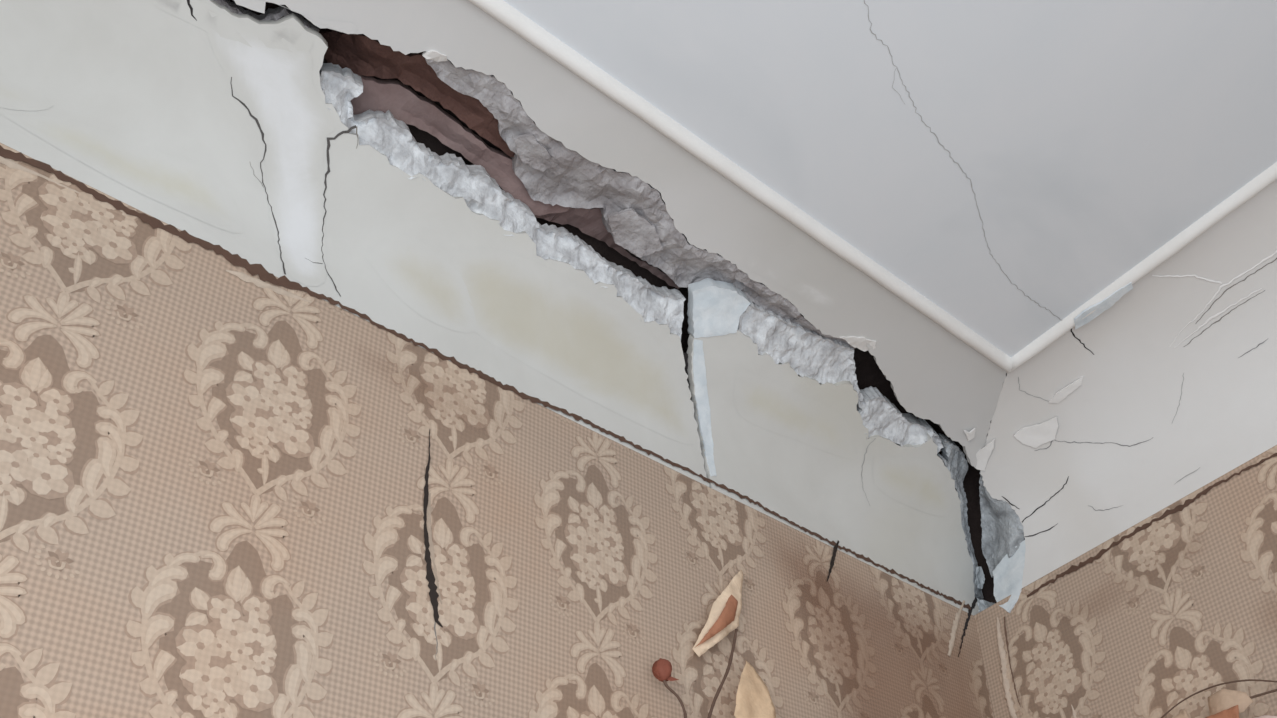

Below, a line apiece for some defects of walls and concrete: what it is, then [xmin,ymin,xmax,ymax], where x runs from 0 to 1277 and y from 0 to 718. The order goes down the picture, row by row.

crack [187,0,1094,613]
flaking render [687,278,751,476]
peeling [964,428,995,471]
peeling [1014,377,1083,448]
crack [1035,373,1184,451]